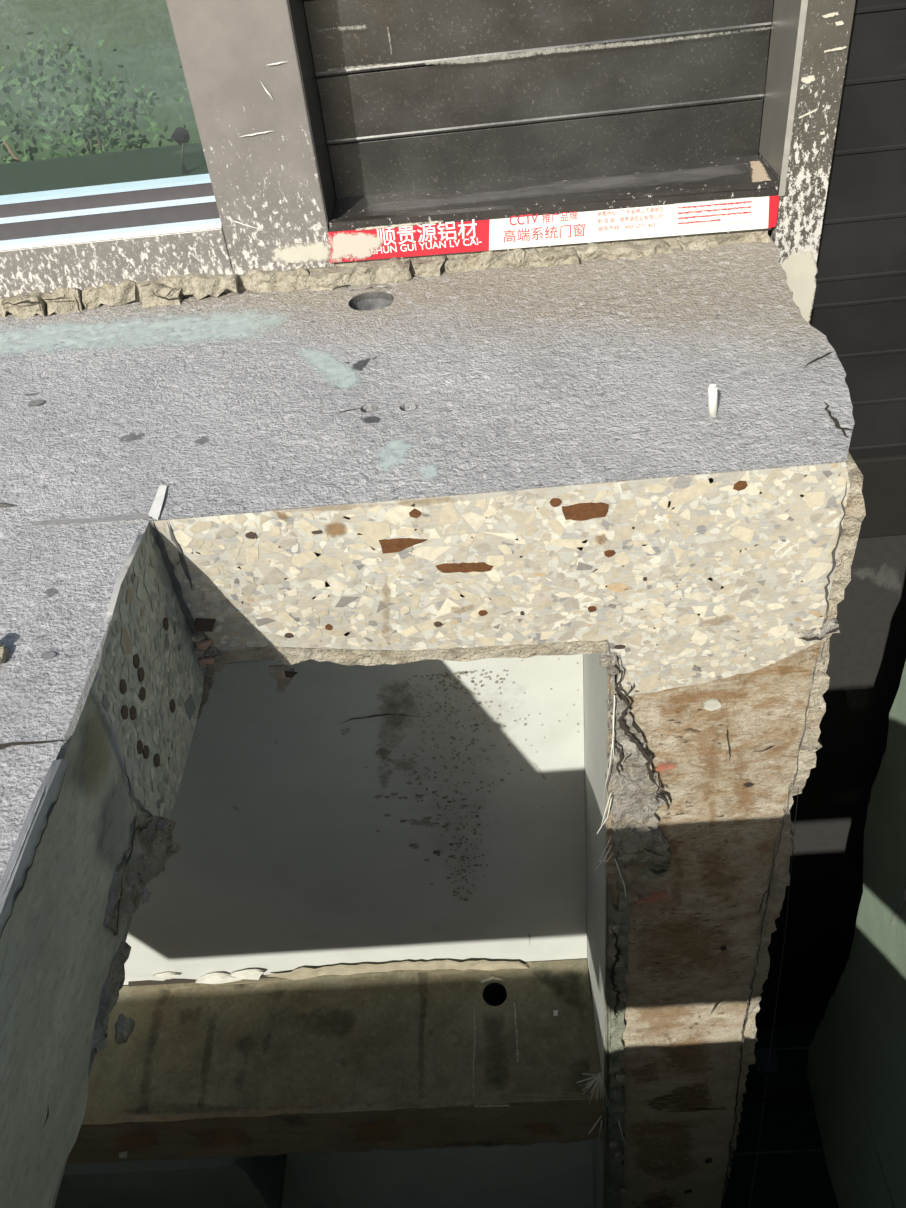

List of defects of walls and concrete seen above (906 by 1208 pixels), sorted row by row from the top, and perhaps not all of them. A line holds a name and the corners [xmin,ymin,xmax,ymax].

spalling [91,815,530,1054]
leakage [374,670,545,901]
spalling [158,463,848,1208]
crack [610,921,622,1026]